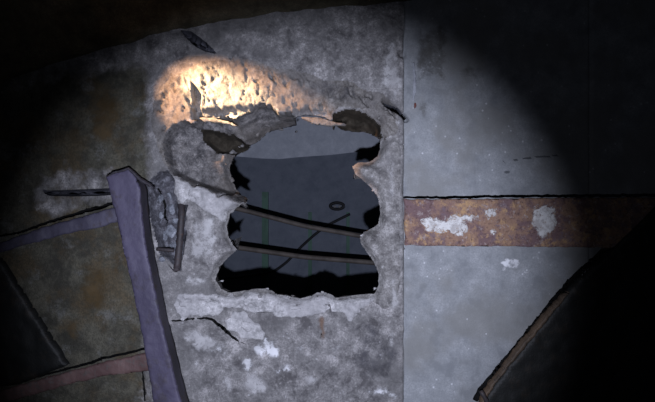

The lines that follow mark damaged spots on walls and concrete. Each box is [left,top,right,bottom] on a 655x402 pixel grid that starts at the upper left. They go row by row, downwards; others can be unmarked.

spalling [146,103,405,340]
crack [171,317,239,343]
water stain [254,338,279,357]